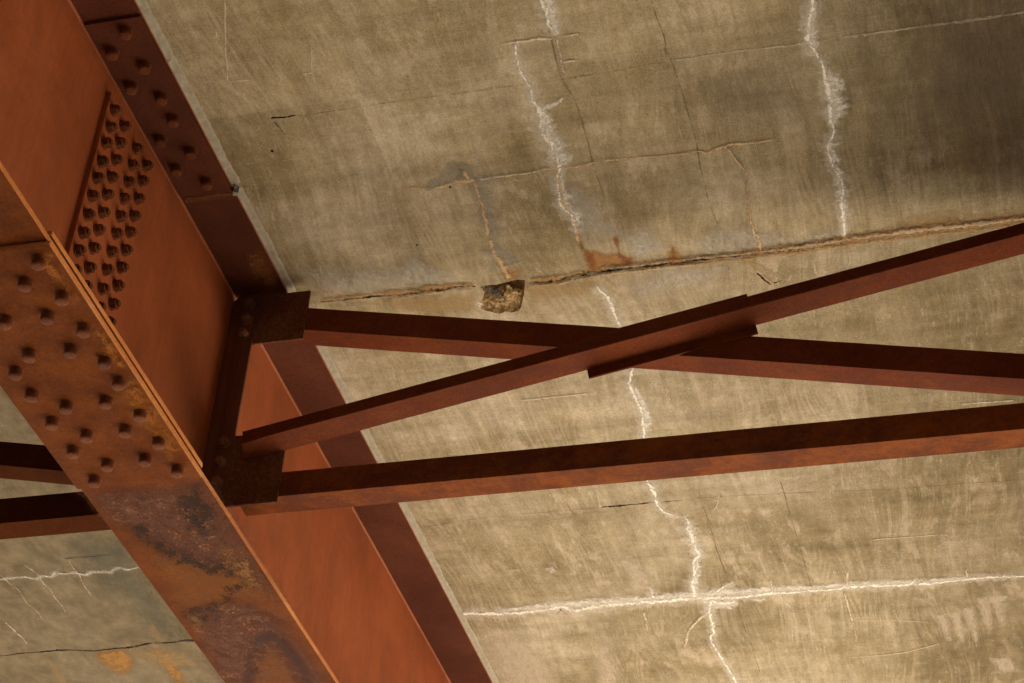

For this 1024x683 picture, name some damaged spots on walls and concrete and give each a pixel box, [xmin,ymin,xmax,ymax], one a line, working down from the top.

crack [400,0,984,327]
rust [531,213,1024,287]
crack [321,286,476,302]
spalling [479,280,525,314]
crack [627,368,652,438]
crack [1,561,136,622]
rust [97,486,323,683]
crack [0,622,194,656]